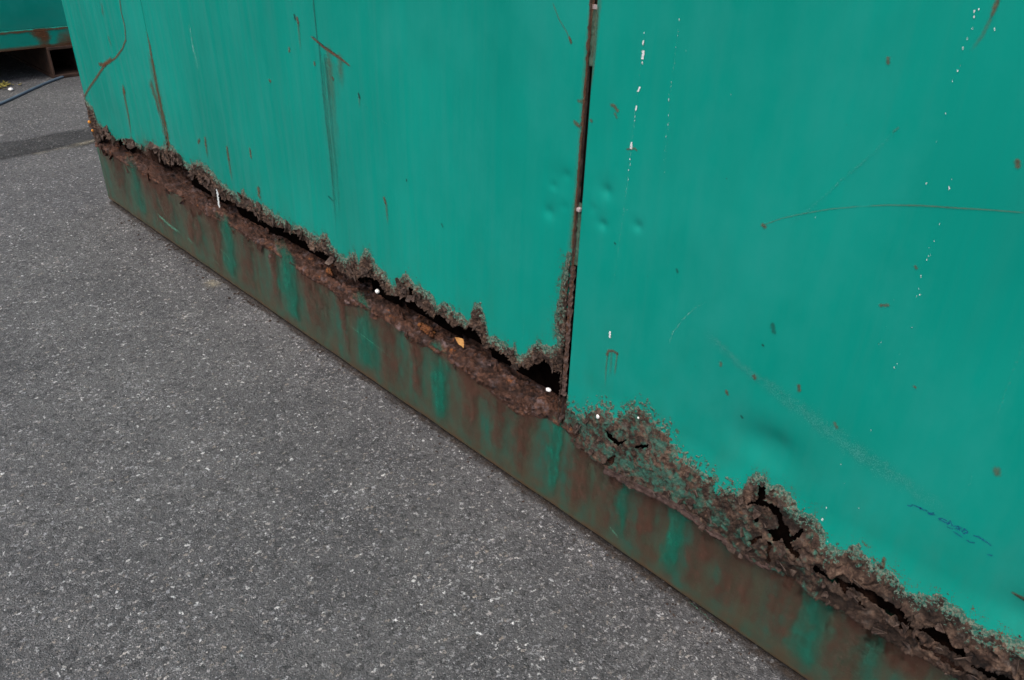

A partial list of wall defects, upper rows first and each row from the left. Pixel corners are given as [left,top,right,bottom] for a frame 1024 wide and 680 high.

rust [84,0,597,426]
spalling [358,277,571,399]
rust [561,395,1024,680]
crack [748,485,851,593]